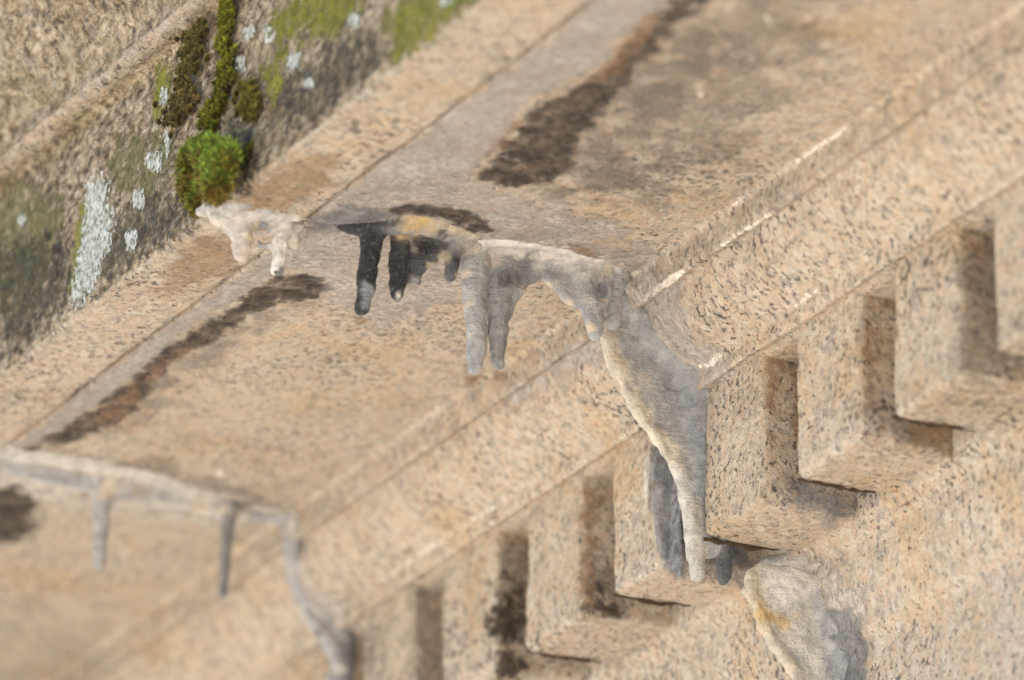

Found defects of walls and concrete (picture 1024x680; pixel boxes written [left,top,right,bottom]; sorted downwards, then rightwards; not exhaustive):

damp [0,0,733,680]
damp [741,553,867,680]